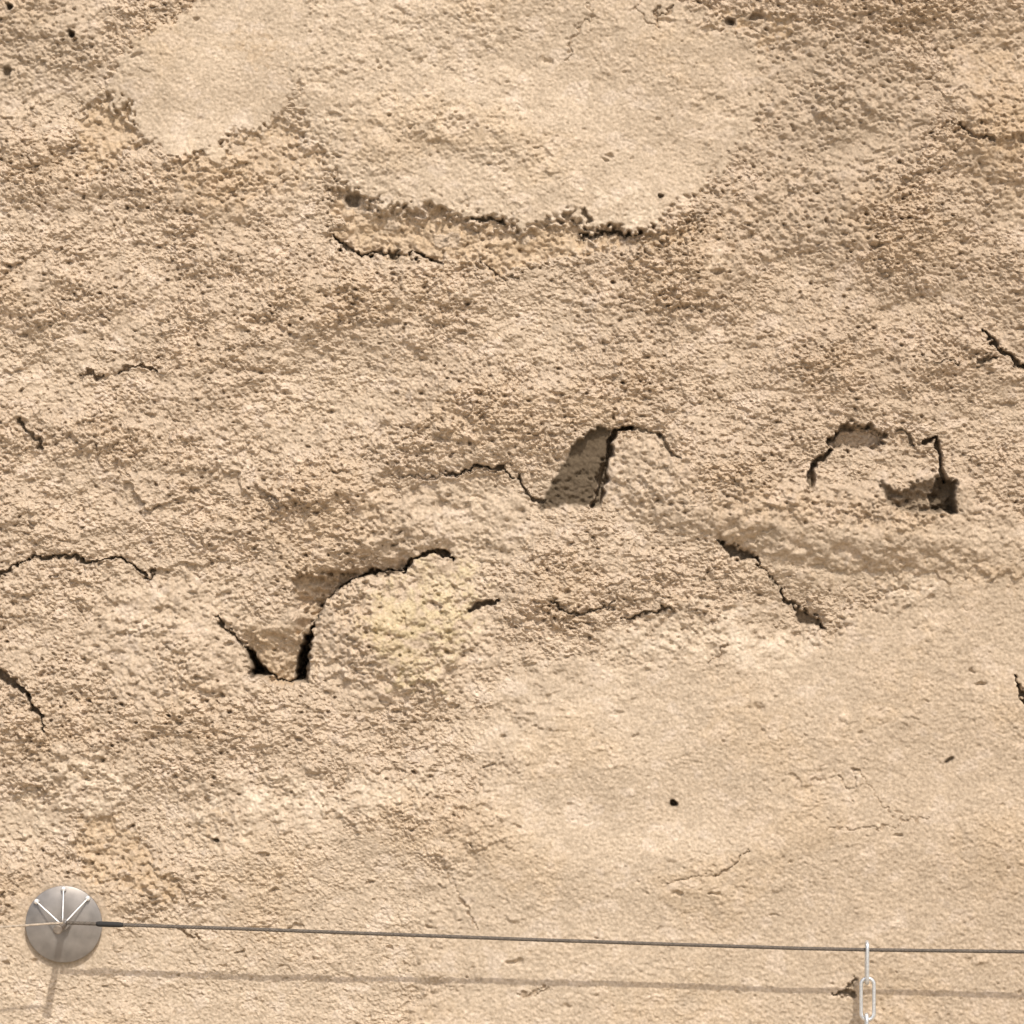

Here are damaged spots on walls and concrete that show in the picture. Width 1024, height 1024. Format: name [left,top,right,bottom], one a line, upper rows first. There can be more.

crack [469,215,507,226]
crack [579,207,643,241]
crack [332,233,444,267]
crack [479,260,520,280]
crack [933,328,1024,369]
crack [397,462,515,480]
spalling [517,422,682,512]
crack [0,553,158,581]
crack [716,539,827,630]
crack [214,548,455,689]
crack [550,599,674,620]
crack [0,668,46,733]